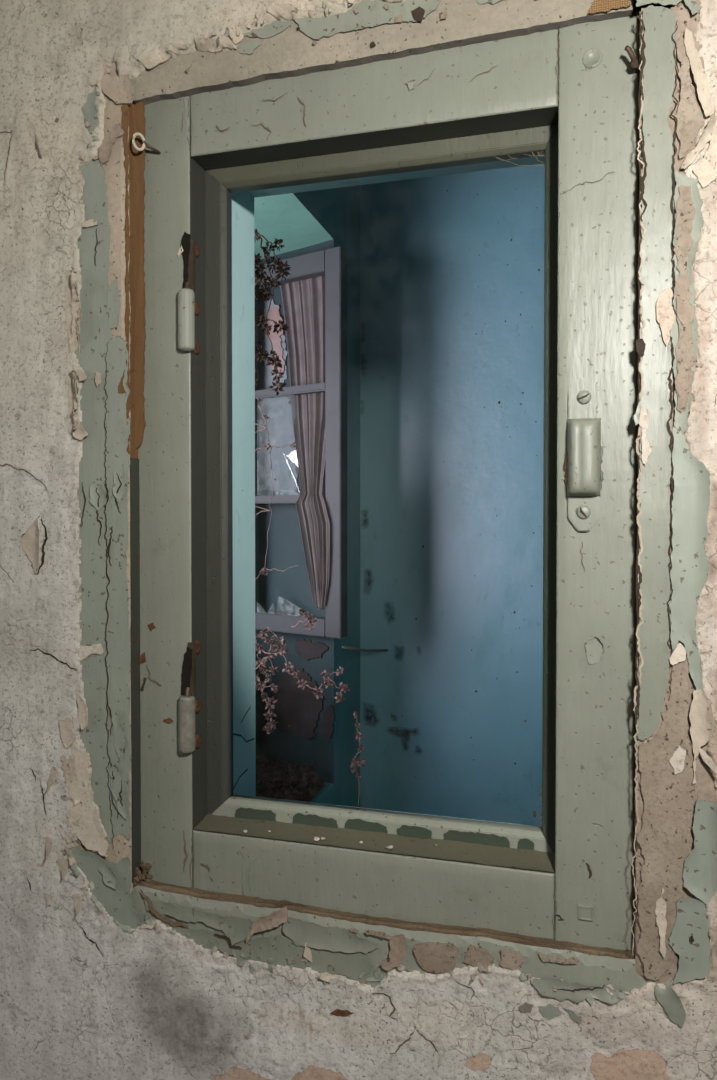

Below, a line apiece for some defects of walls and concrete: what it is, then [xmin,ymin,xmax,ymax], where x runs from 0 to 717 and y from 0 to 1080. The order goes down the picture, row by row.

peeling [136,0,447,69]
peeling [634,0,717,1028]
peeling [44,59,629,1024]
crack [31,648,77,671]
peeling [292,1065,348,1080]
peeling [466,1053,492,1072]
peeling [590,1049,669,1080]